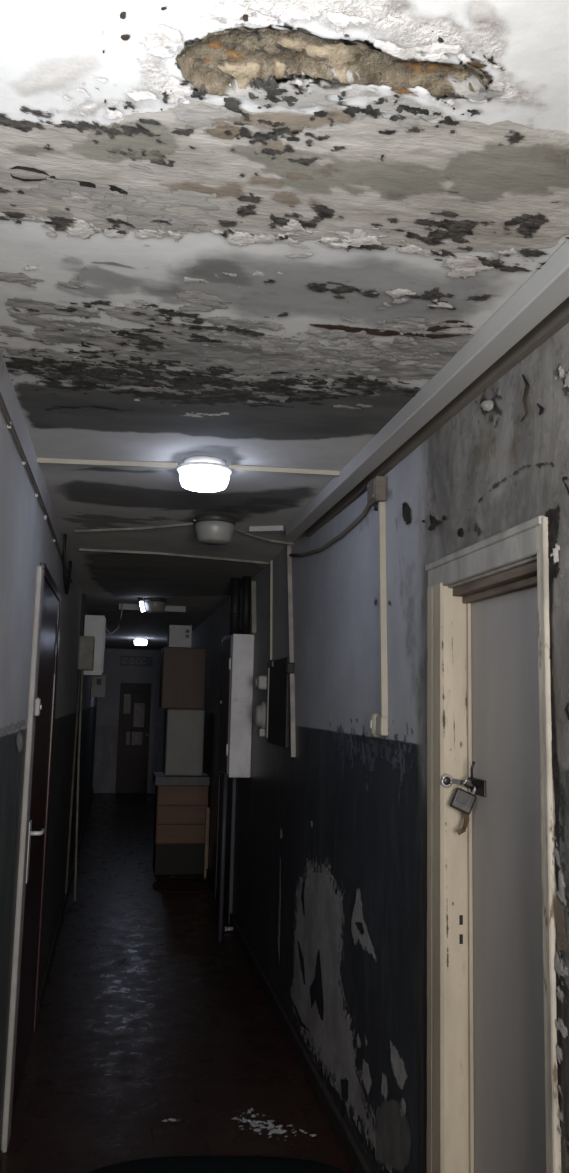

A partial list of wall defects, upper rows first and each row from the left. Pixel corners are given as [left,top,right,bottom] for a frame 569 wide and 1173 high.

peeling [0,14,569,278]
damp [498,125,569,163]
damp [171,211,549,324]
damp [3,300,420,440]
peeling [0,272,474,414]
spalling [480,389,501,427]
peeling [556,366,569,396]
damp [67,468,309,513]
peeling [278,849,411,1173]